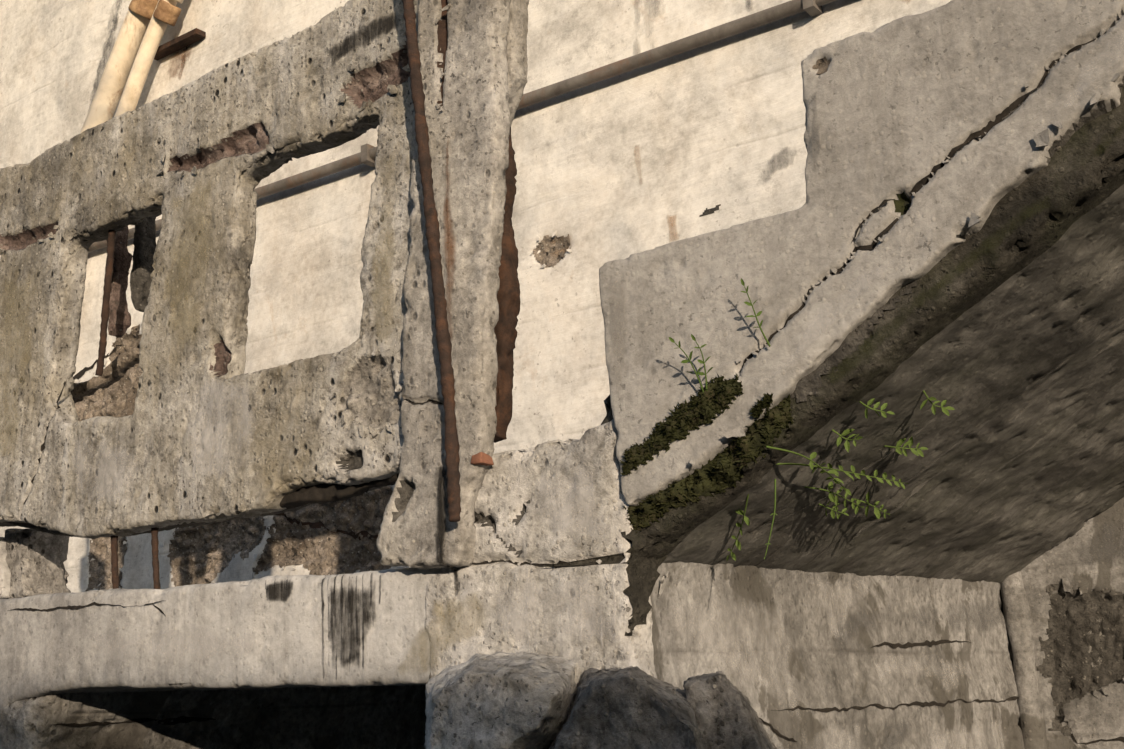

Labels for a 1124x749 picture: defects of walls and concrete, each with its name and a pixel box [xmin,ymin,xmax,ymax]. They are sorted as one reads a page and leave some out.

crack [735,14,1124,372]
rust [445,201,454,276]
rust [494,127,520,443]
spalling [530,231,572,268]
spalling [151,347,415,589]
crack [7,600,165,615]
damp [321,575,381,679]
crack [871,640,971,649]
spalling [1036,578,1124,736]
crack [54,716,216,727]
crack [759,696,1019,742]